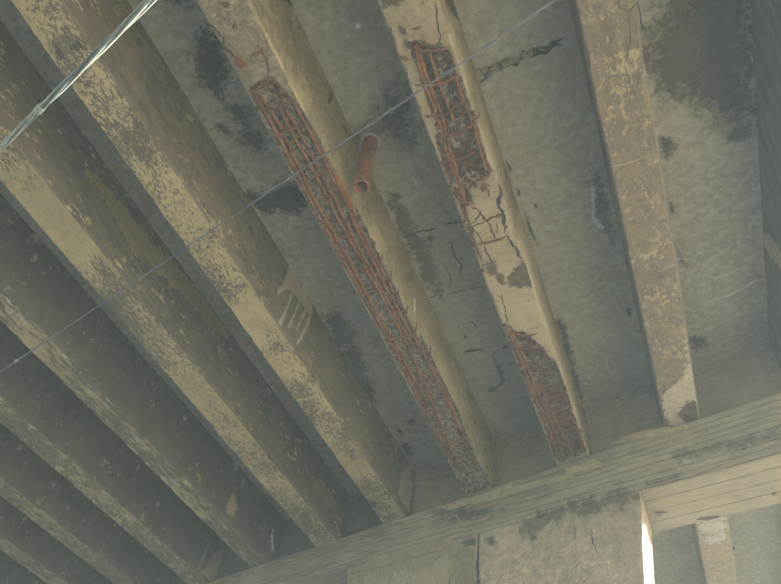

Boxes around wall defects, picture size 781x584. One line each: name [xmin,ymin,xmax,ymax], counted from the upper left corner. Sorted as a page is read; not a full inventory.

water stain [187,27,266,151]
spalling [249,75,491,494]
spalling [408,40,491,273]
crack [470,185,522,263]
crack [480,37,563,83]
water stain [640,0,757,142]
spalling [502,323,586,462]